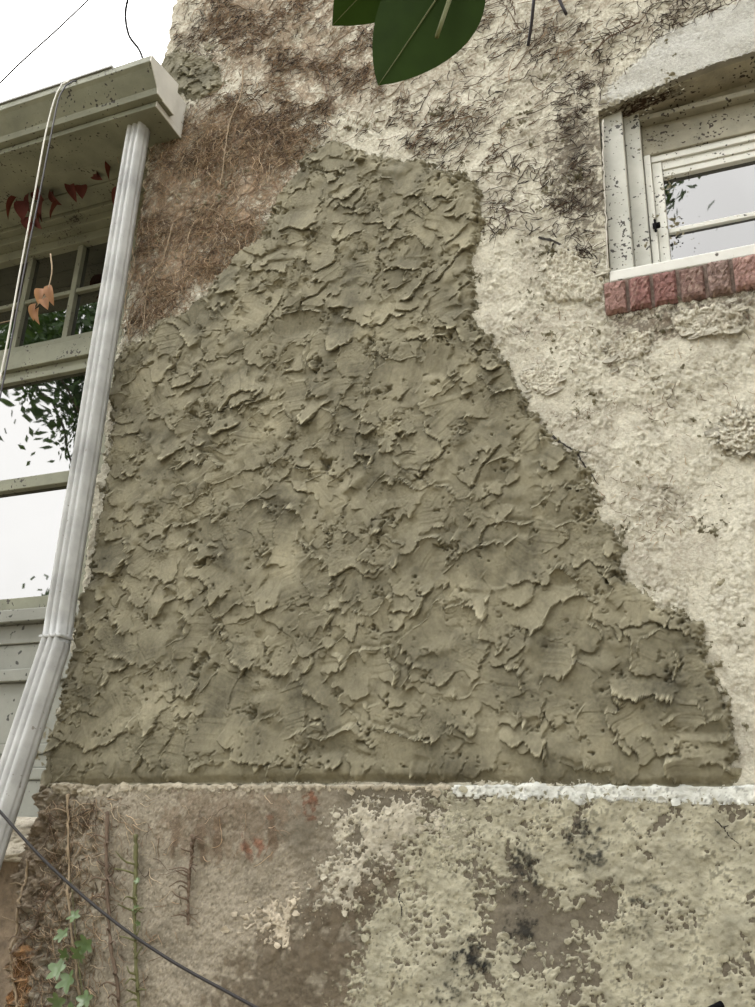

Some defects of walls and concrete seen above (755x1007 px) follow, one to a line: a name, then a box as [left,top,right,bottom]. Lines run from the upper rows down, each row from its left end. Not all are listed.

peeling [10,781,755,1007]
damp [509,844,540,903]
damp [567,819,608,870]
damp [503,920,538,945]
damp [436,934,491,1003]